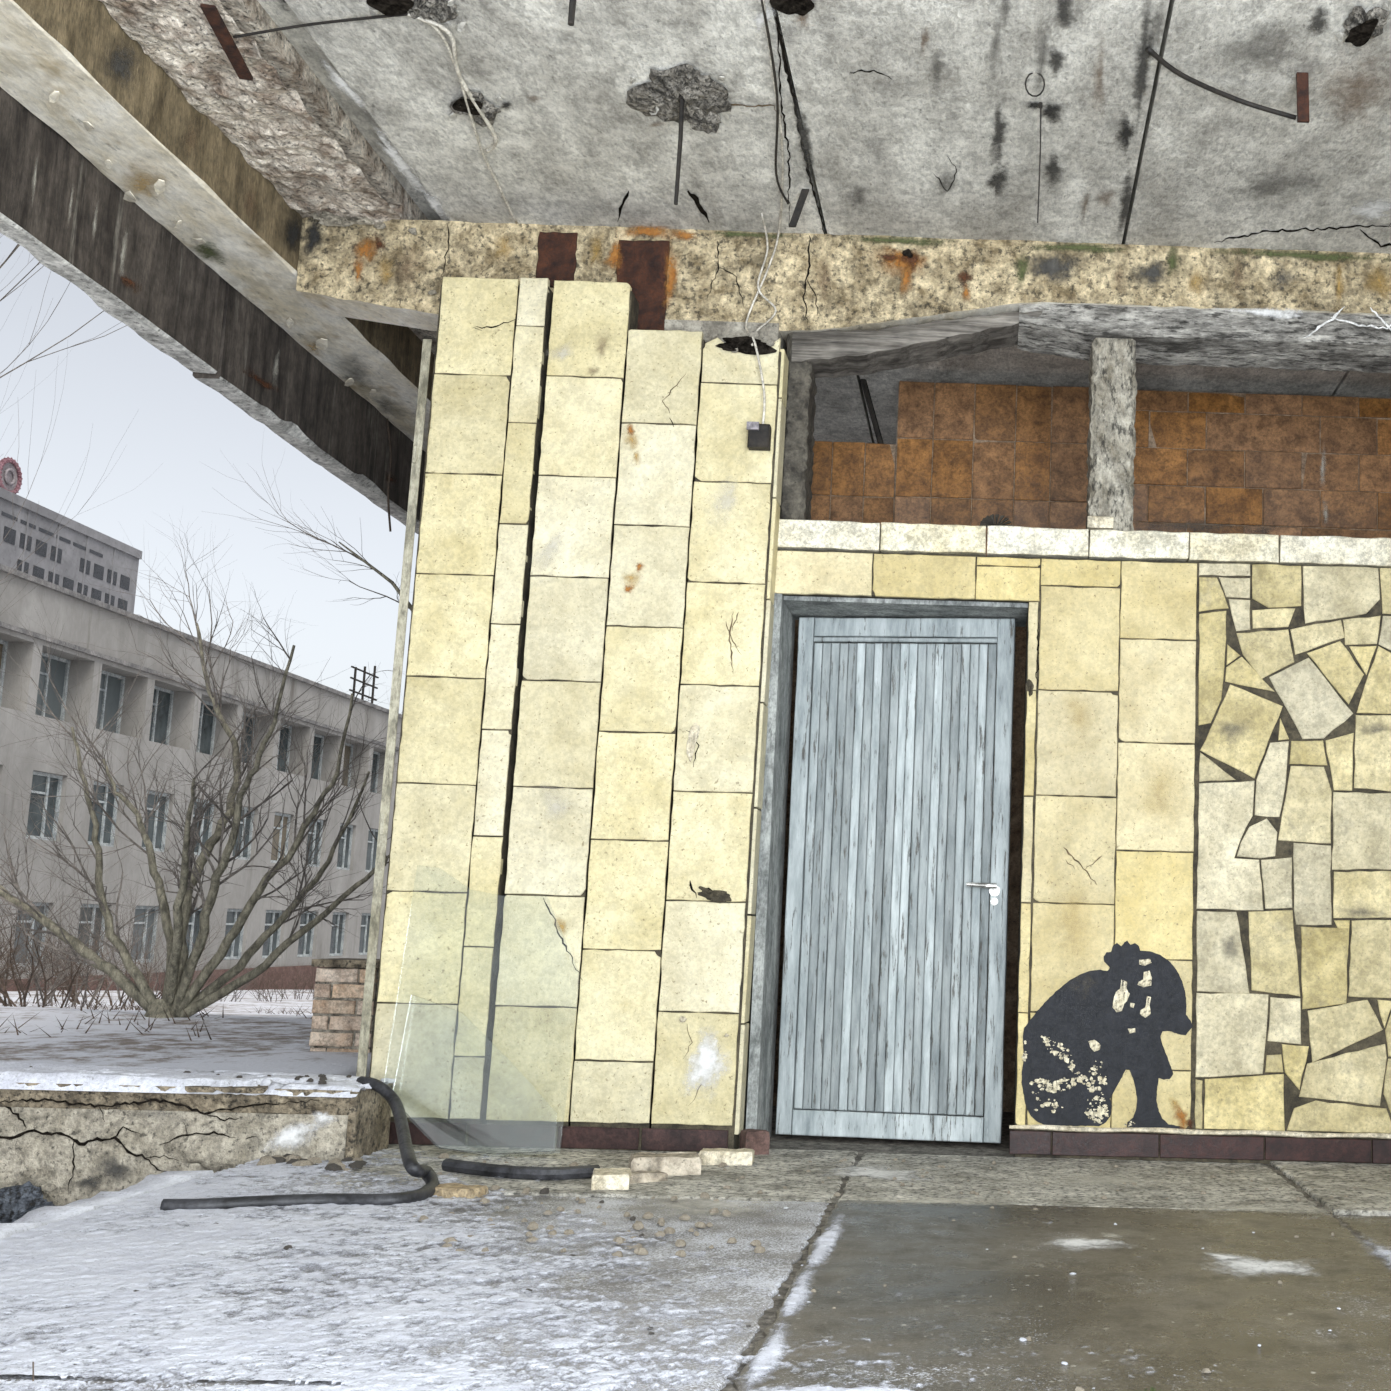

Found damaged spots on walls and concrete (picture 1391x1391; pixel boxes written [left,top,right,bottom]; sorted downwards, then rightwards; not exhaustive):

spalling [366,0,466,32]
spalling [769,0,818,21]
spalling [1311,3,1389,47]
spalling [449,91,512,127]
spalling [626,64,782,134]
crack [1214,202,1391,248]
rust [594,226,694,268]
rust [666,257,677,298]
rust [881,249,919,290]
spalling [711,331,777,355]
crack [0,1098,317,1188]